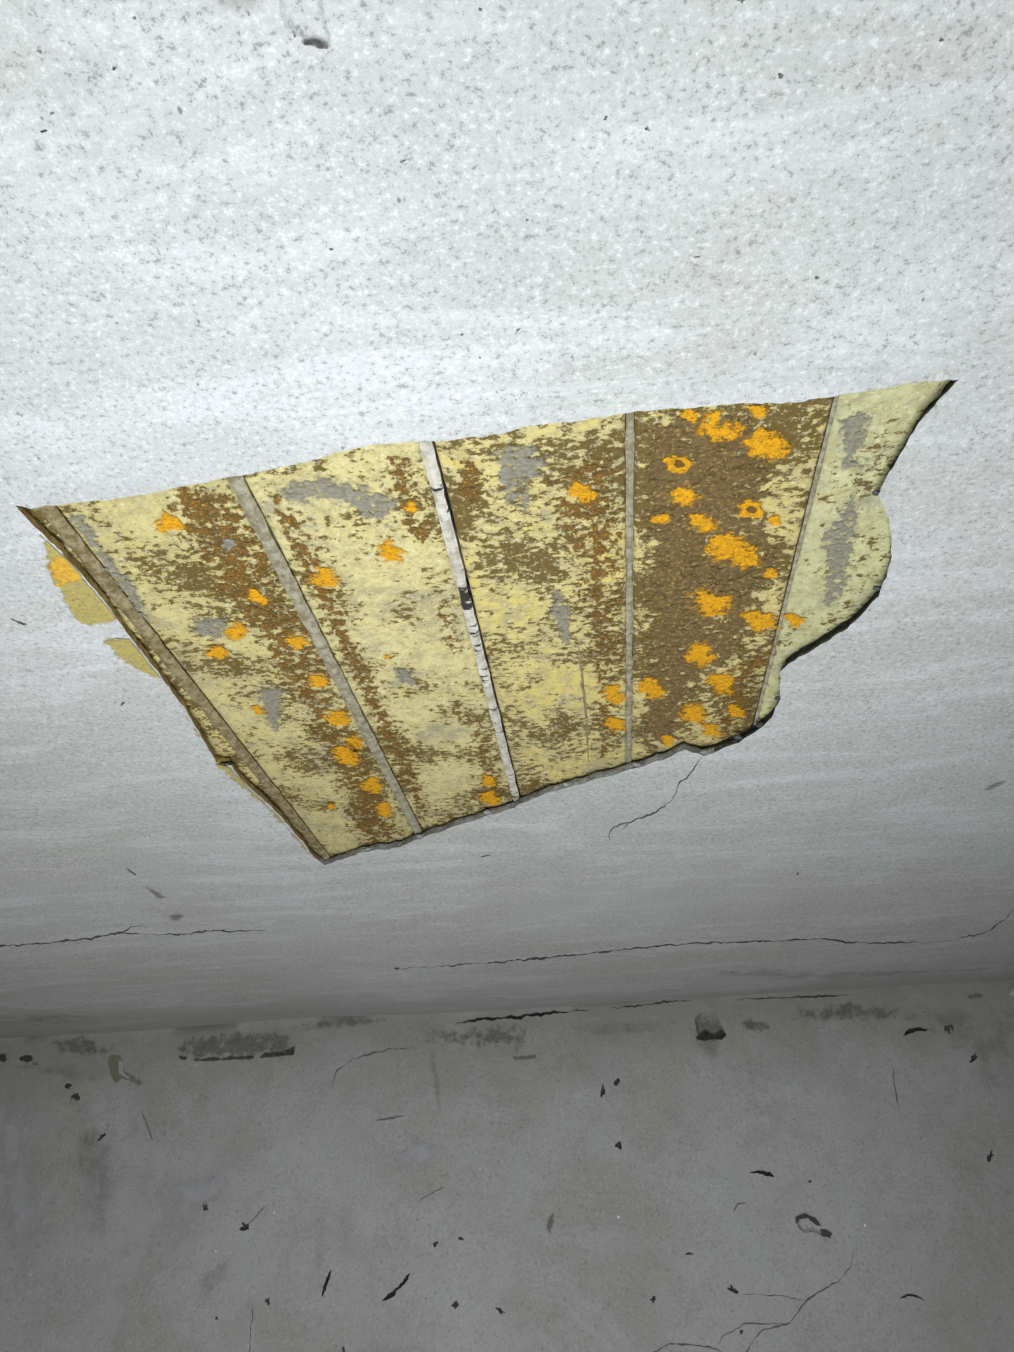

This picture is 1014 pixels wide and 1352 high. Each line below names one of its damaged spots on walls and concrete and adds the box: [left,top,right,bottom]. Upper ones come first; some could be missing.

spalling [872,379,959,496]
spalling [780,546,892,671]
spalling [16,505,780,865]